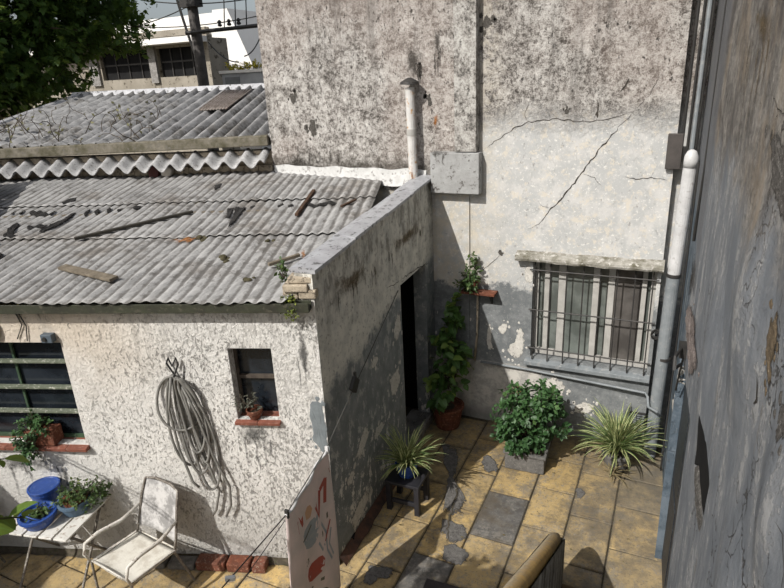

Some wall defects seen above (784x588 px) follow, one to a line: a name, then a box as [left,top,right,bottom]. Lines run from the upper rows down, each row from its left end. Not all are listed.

crack [483,74,662,228]
spalling [764,121,784,219]
leakage [337,268,376,296]
peeling [486,320,527,367]
spalling [764,299,778,396]
spalling [773,391,784,456]